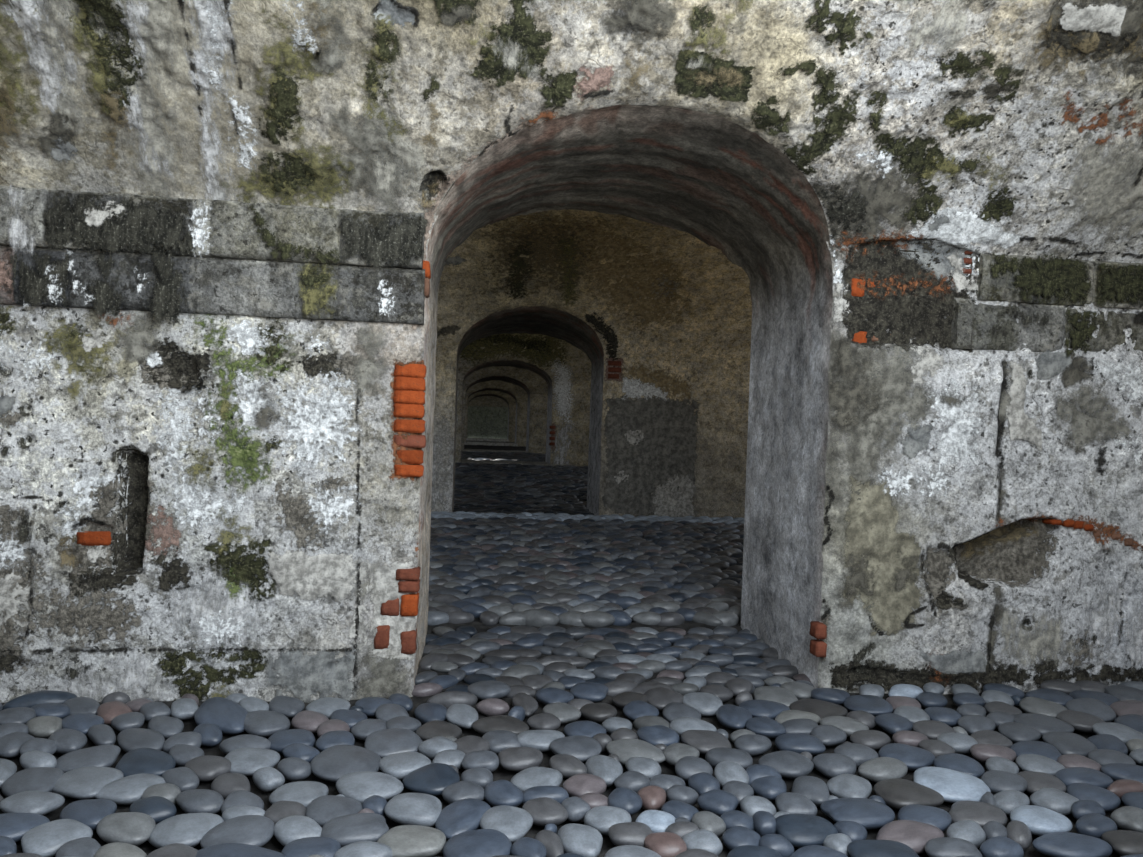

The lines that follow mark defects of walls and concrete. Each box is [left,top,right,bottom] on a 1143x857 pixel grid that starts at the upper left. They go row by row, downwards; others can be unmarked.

crack [178,0,202,116]
crack [224,0,242,135]
damp [0,0,258,326]
damp [0,330,56,384]
spalling [0,478,151,649]
damp [54,465,120,546]
spalling [145,478,191,592]
flaking render [809,229,1143,693]
crack [995,360,1008,521]
spalling [0,654,28,672]
spalling [65,665,87,679]